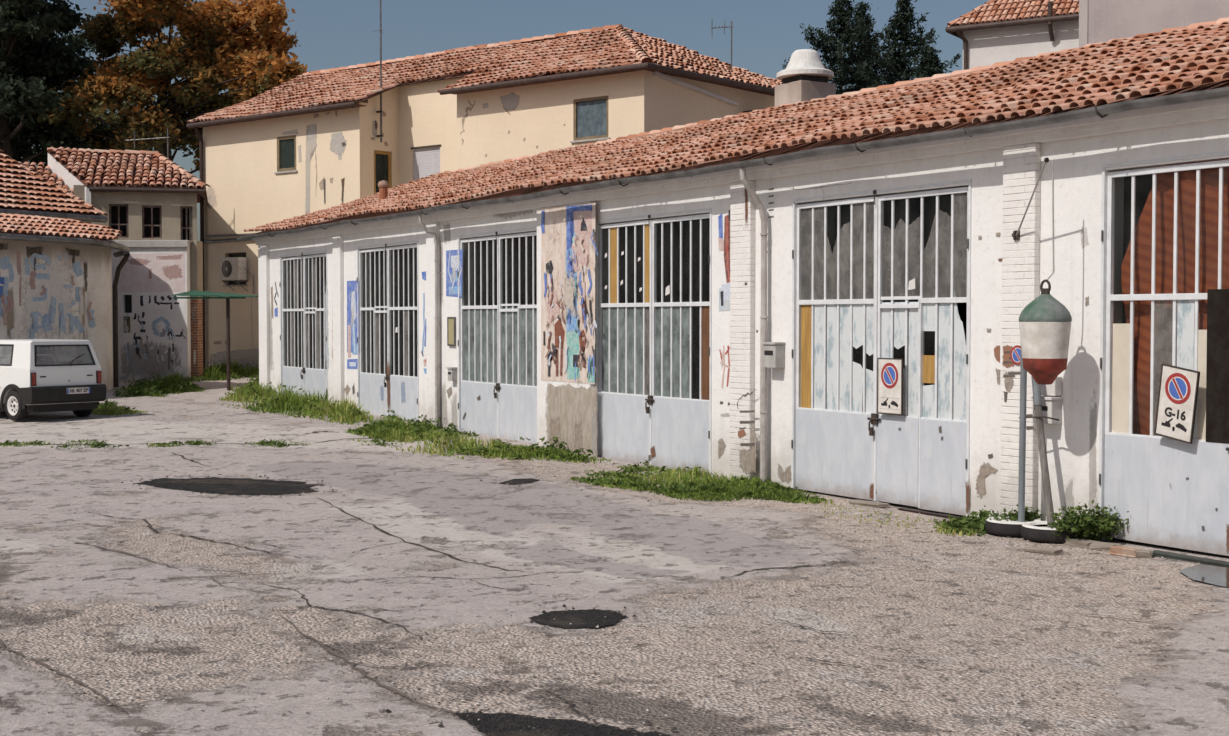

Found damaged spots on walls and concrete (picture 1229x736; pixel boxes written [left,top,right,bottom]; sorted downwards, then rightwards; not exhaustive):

peeling [483,92,520,115]
peeling [329,131,346,160]
spalling [994,345,1015,402]